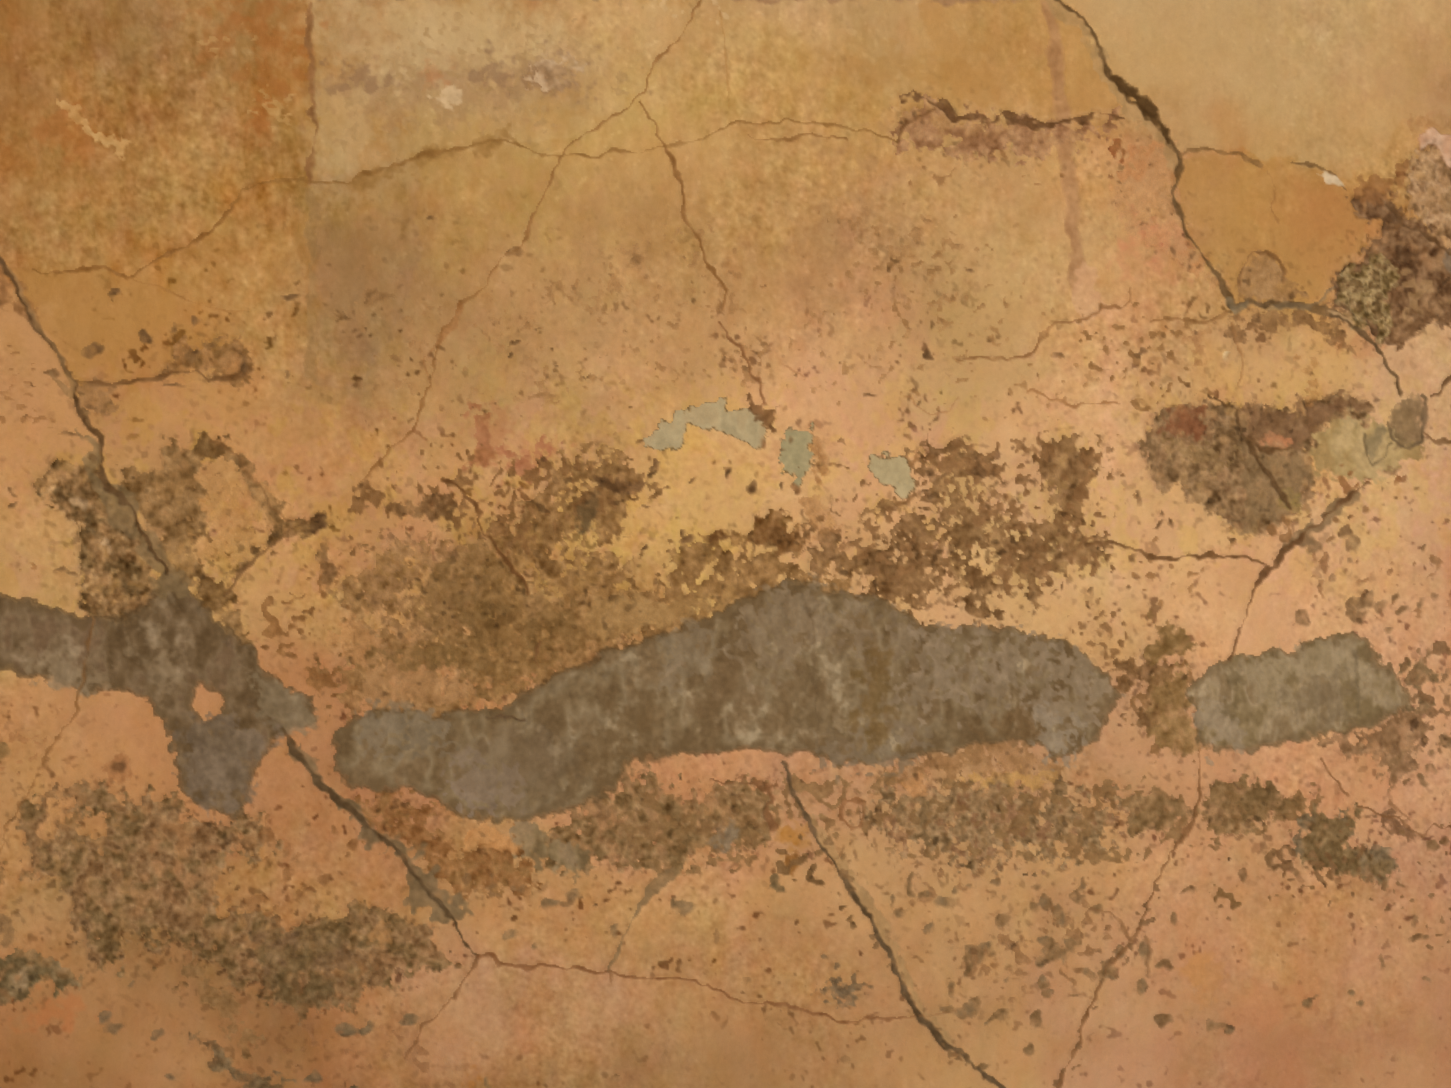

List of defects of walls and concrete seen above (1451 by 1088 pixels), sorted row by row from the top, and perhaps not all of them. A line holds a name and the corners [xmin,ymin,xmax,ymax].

crack [0,0,900,601]
spalling [889,0,1451,552]
crack [957,0,1451,663]
crack [0,617,96,856]
crack [283,587,1006,1088]
spalling [0,219,1451,1088]
crack [1056,748,1203,1088]
crack [1353,649,1363,719]
crack [1320,757,1451,840]